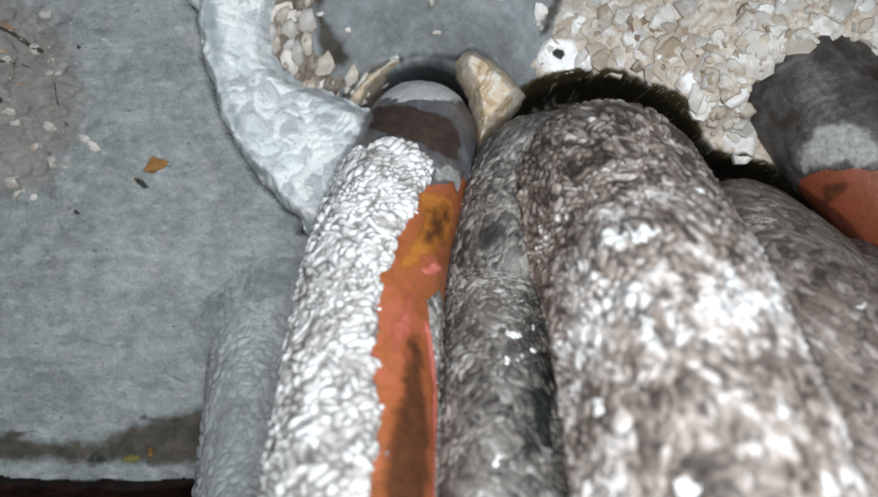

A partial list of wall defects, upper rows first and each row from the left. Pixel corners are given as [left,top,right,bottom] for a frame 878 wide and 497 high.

water stain [0,411,201,464]